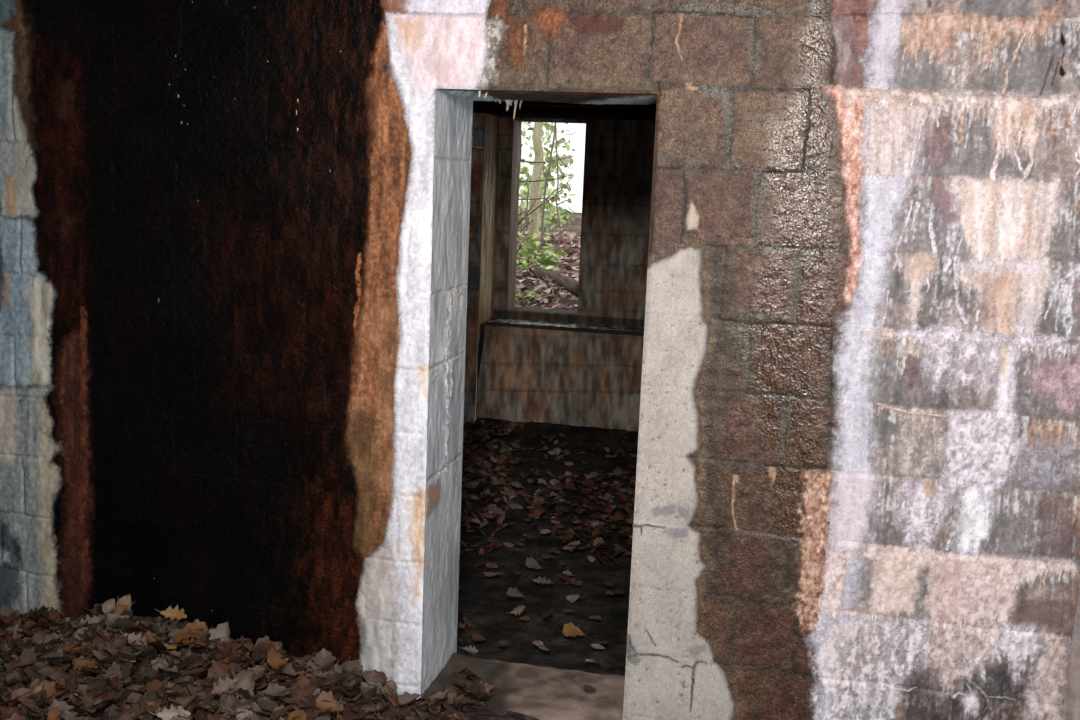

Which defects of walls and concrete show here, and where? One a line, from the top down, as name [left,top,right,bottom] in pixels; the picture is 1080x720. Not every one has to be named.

water stain [842,0,1068,181]
water stain [877,87,1080,558]
spalling [654,506,689,537]
crack [627,629,708,712]
water stain [817,545,1076,720]